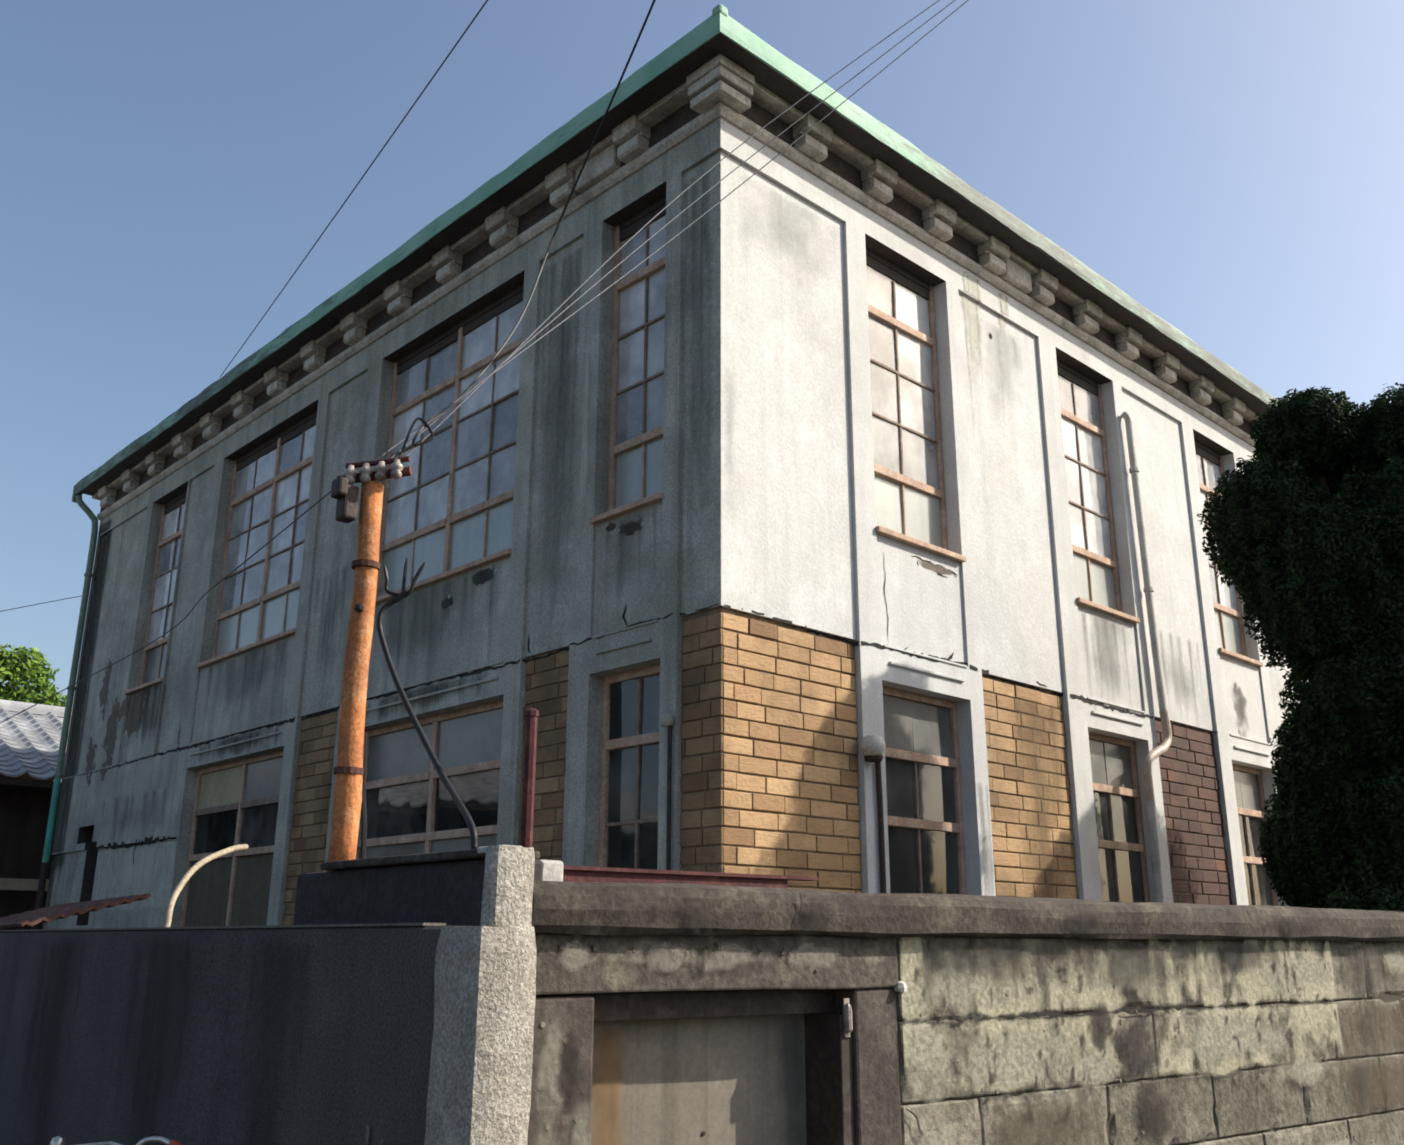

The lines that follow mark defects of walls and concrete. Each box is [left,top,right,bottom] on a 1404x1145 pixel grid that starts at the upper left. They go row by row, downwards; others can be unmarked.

spalling [917,559,957,577]
peeling [83,654,148,787]
crack [75,556,1218,776]
water stain [560,1036,580,1100]
water stain [901,919,1404,1145]